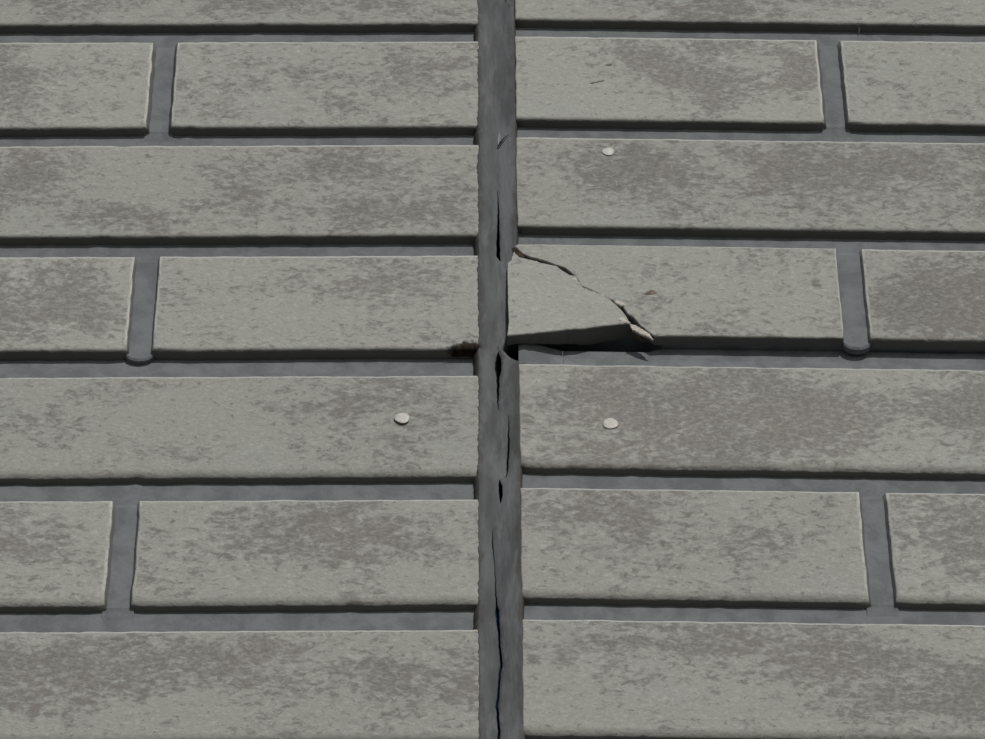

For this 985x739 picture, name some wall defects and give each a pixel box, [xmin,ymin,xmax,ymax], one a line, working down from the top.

crack [496,191,525,261]
crack [495,351,510,504]
crack [492,531,503,739]